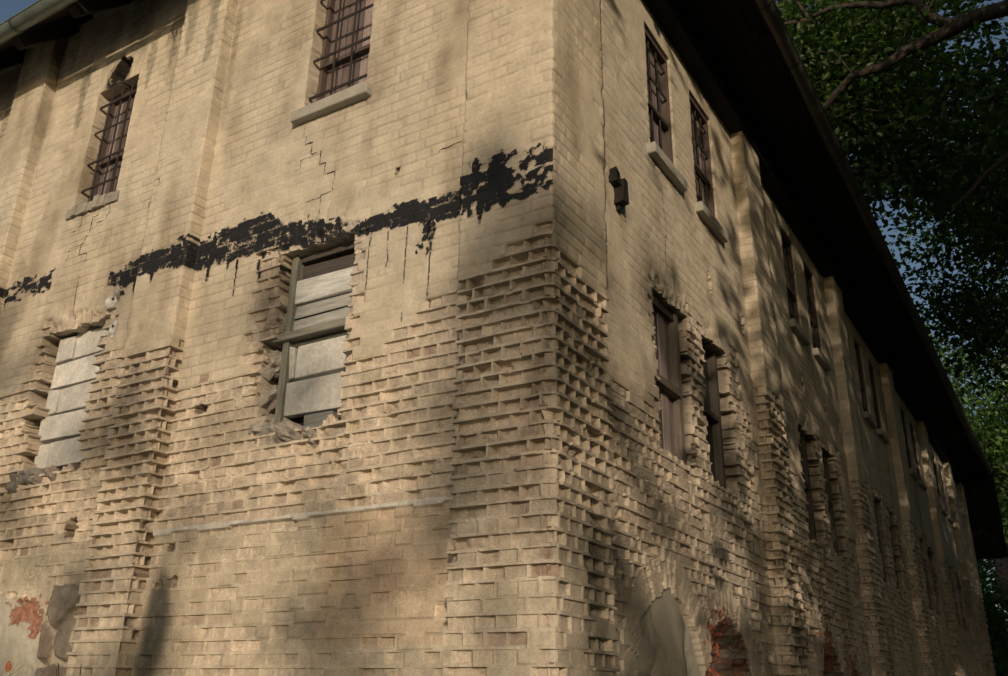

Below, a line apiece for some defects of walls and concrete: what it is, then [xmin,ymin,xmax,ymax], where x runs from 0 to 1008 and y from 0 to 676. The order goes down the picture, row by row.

crack [296,128,335,211]
spalling [0,217,893,676]
spalling [903,520,996,676]